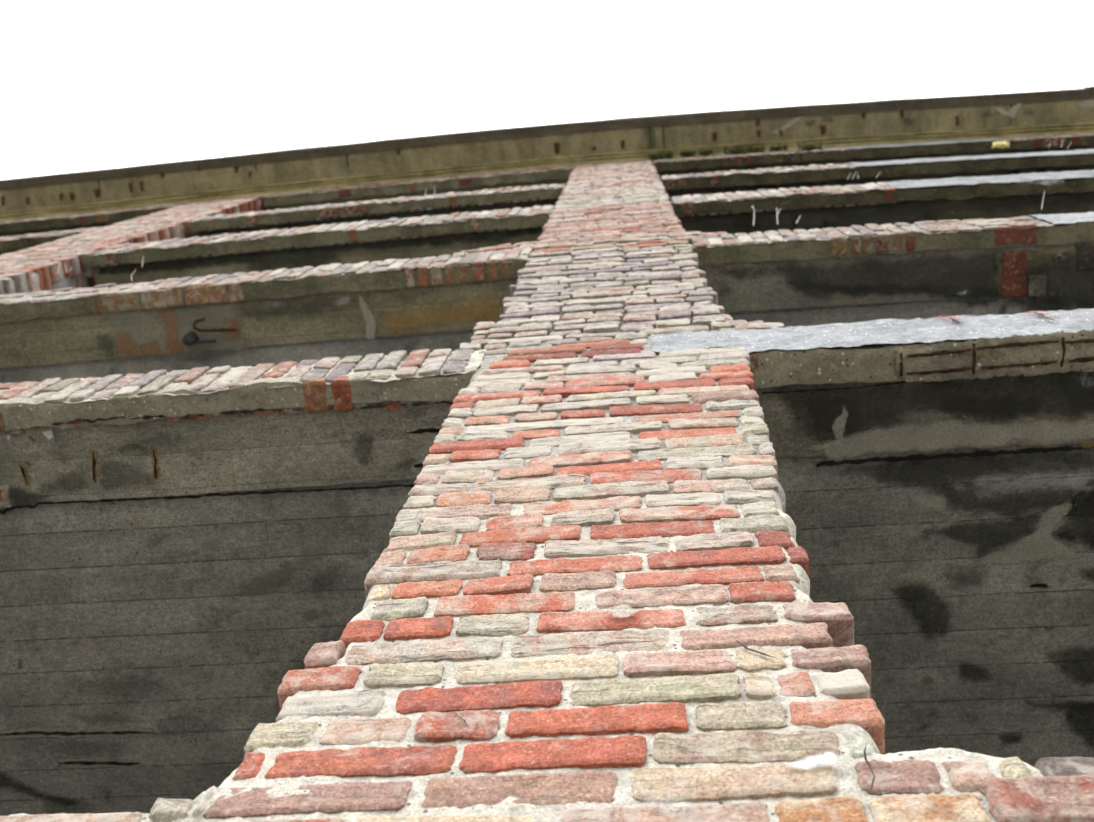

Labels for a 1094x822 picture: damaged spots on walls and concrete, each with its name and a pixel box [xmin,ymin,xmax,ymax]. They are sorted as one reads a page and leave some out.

spalling [995,225,1094,299]
spalling [895,329,1094,382]
water stain [781,372,1094,563]
spalling [0,484,11,508]
water stain [899,585,949,634]
water stain [1053,648,1094,684]
water stain [1035,702,1094,746]
water stain [0,774,75,805]